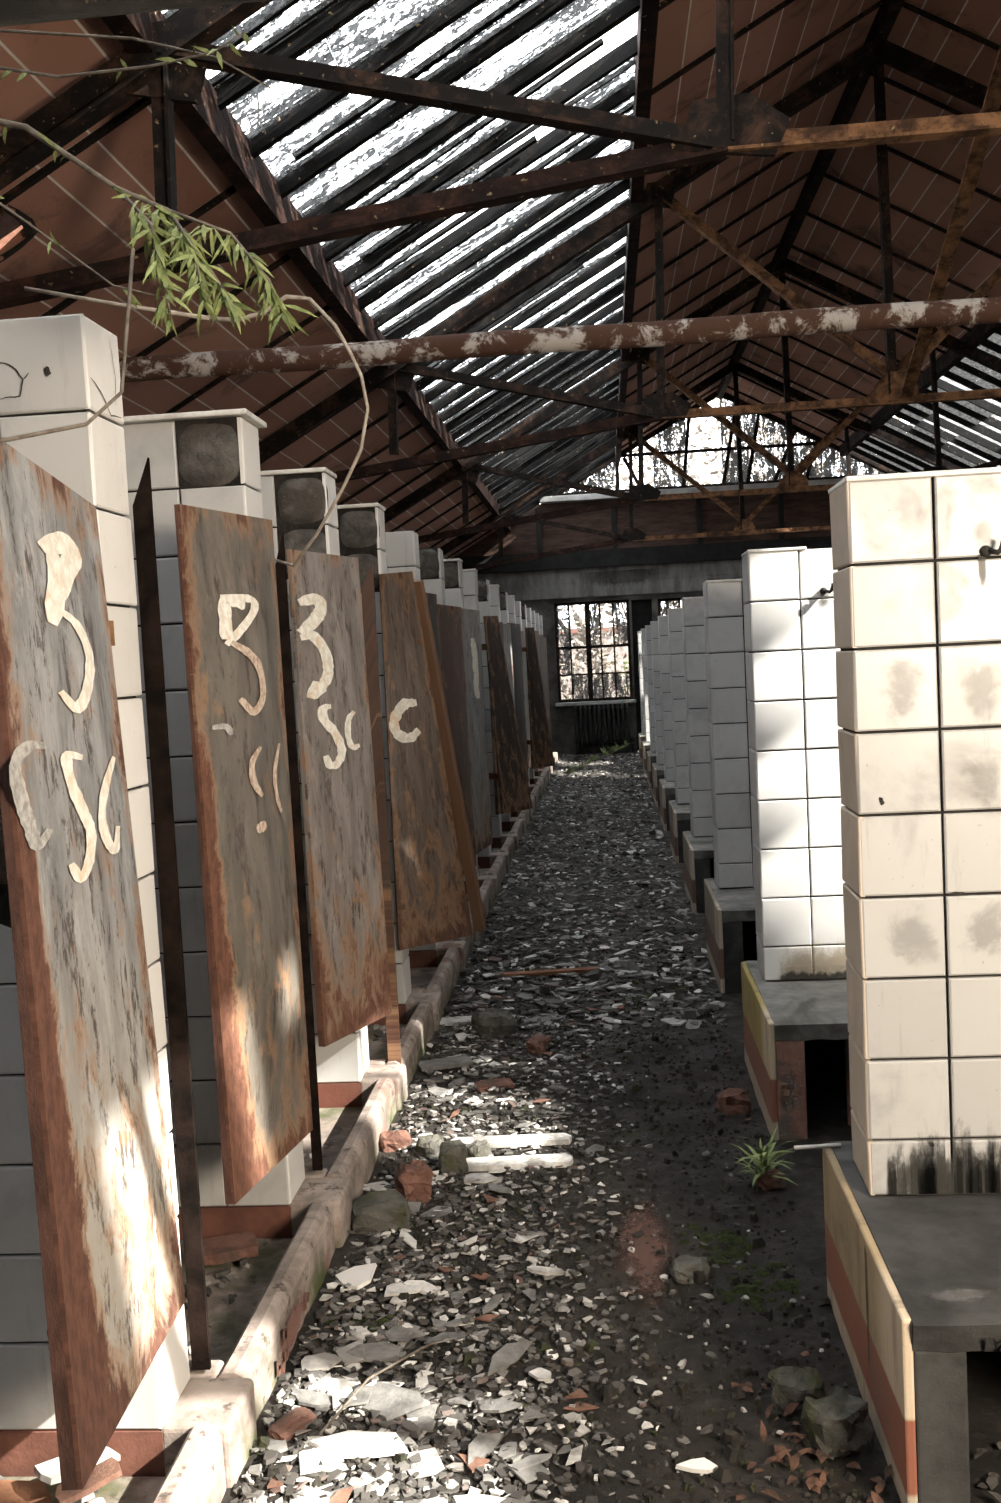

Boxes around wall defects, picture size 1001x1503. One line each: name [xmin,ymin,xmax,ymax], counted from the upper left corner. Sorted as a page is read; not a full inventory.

mould [888,1138,1001,1195]